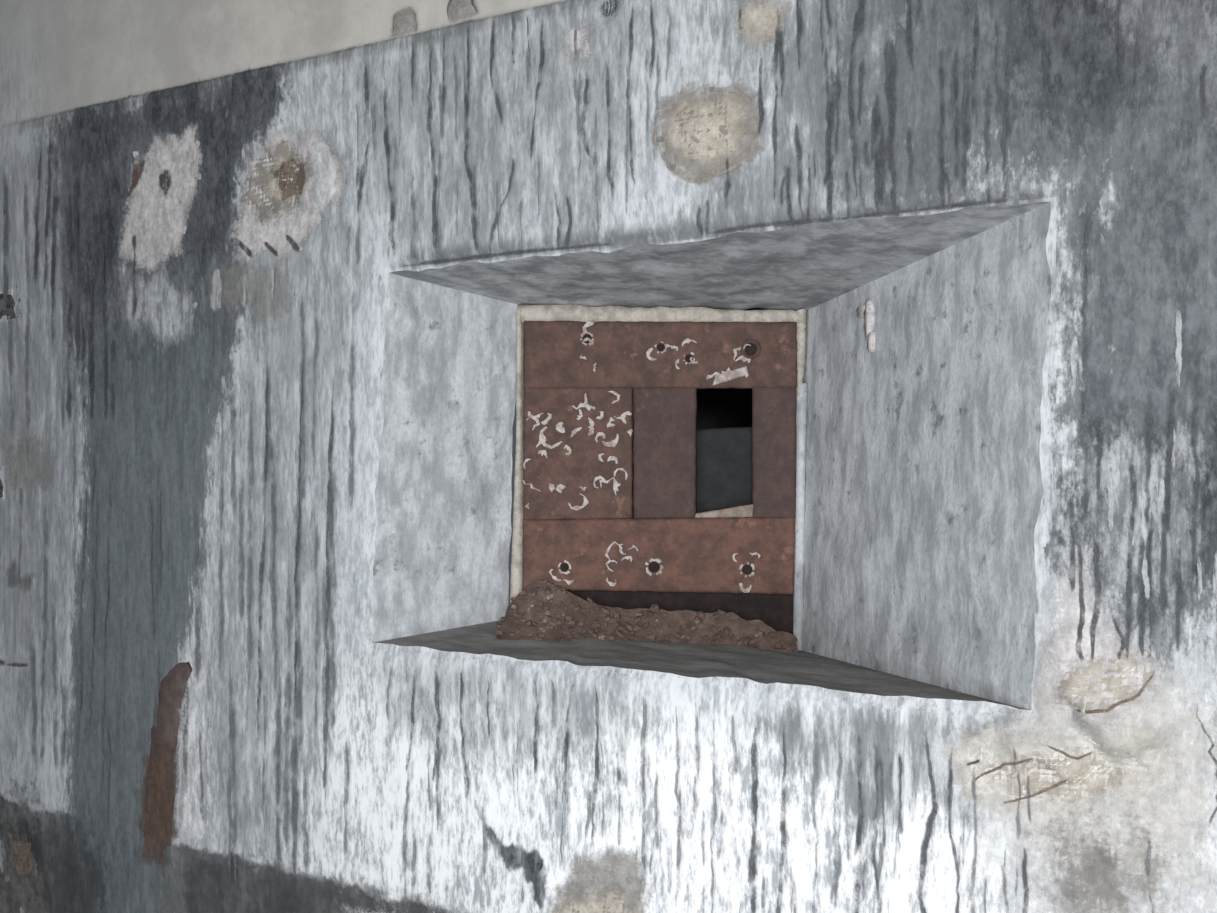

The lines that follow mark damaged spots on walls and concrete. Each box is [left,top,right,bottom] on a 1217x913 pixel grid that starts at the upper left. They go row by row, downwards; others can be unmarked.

peeling [119,124,222,345]
flaking render [230,127,344,306]
leakage [427,22,523,252]
leakage [574,5,671,232]
flaking render [652,84,759,183]
leakage [3,64,355,913]
leakage [677,0,1217,913]
rust [138,742,177,863]
leakage [428,674,441,829]
flaking render [486,826,644,913]
leakage [585,692,621,845]
leakage [640,699,723,913]